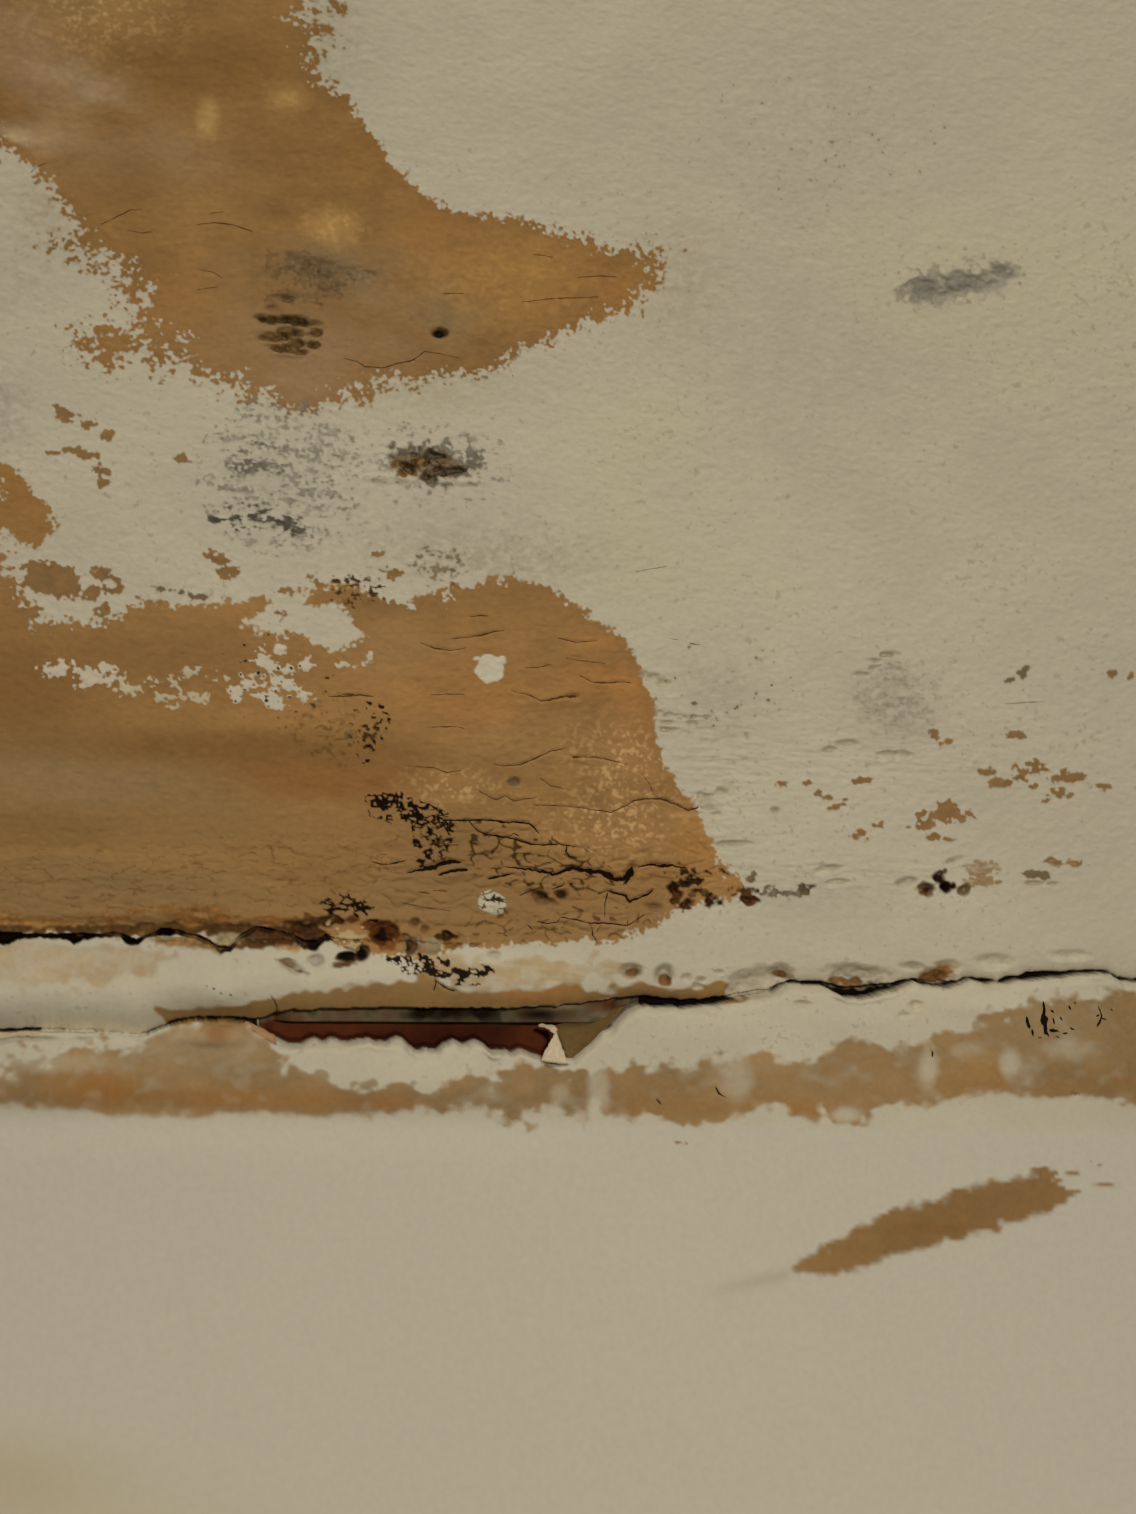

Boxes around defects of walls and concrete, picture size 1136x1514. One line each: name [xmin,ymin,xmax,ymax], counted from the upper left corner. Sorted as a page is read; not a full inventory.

spalling [892,245,1028,313]
peeling [6,558,126,623]
peeling [150,653,318,712]
peeling [976,757,1113,805]
peeling [906,798,977,843]
crack [0,749,698,991]
crack [0,1026,42,1034]
crack [147,996,277,1035]
spalling [244,961,816,1064]
crack [639,994,736,1010]
crack [773,969,1136,1000]
leakage [789,1159,1120,1282]